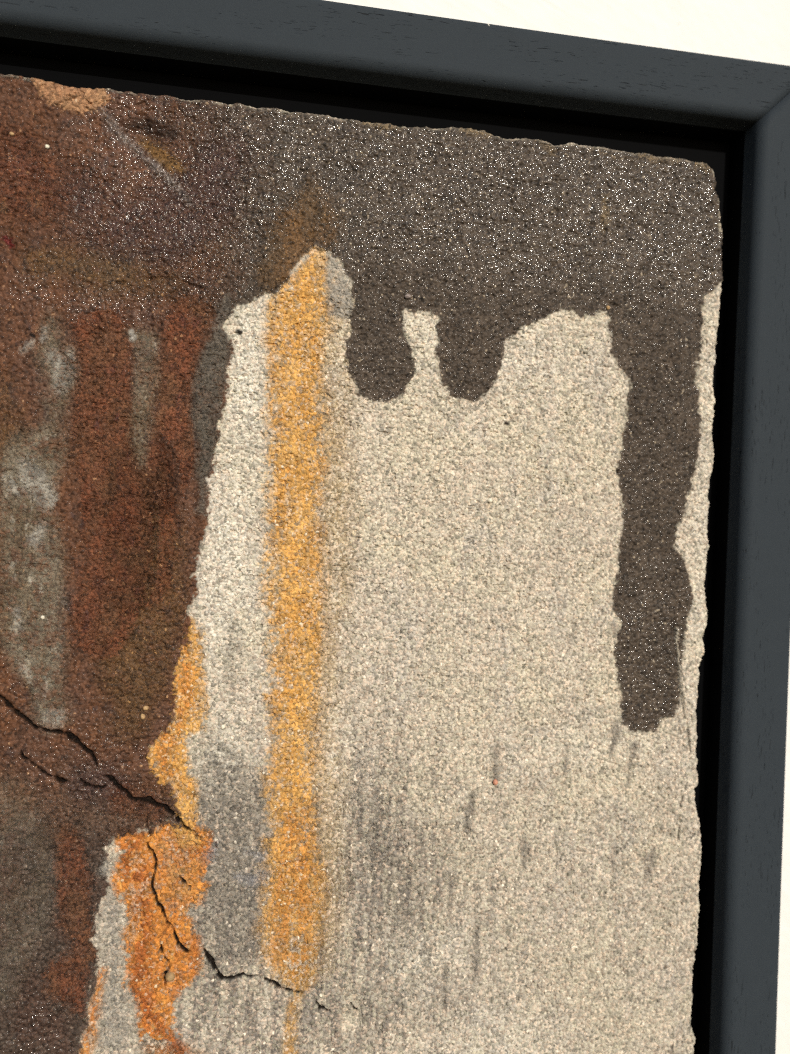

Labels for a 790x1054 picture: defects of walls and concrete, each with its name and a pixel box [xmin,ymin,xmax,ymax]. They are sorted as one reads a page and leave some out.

corrosion [0,74,237,1054]
water stain [129,330,151,454]
crack [0,695,357,1010]
corrosion [261,186,334,1054]
water stain [151,95,723,786]
water stain [472,928,480,983]